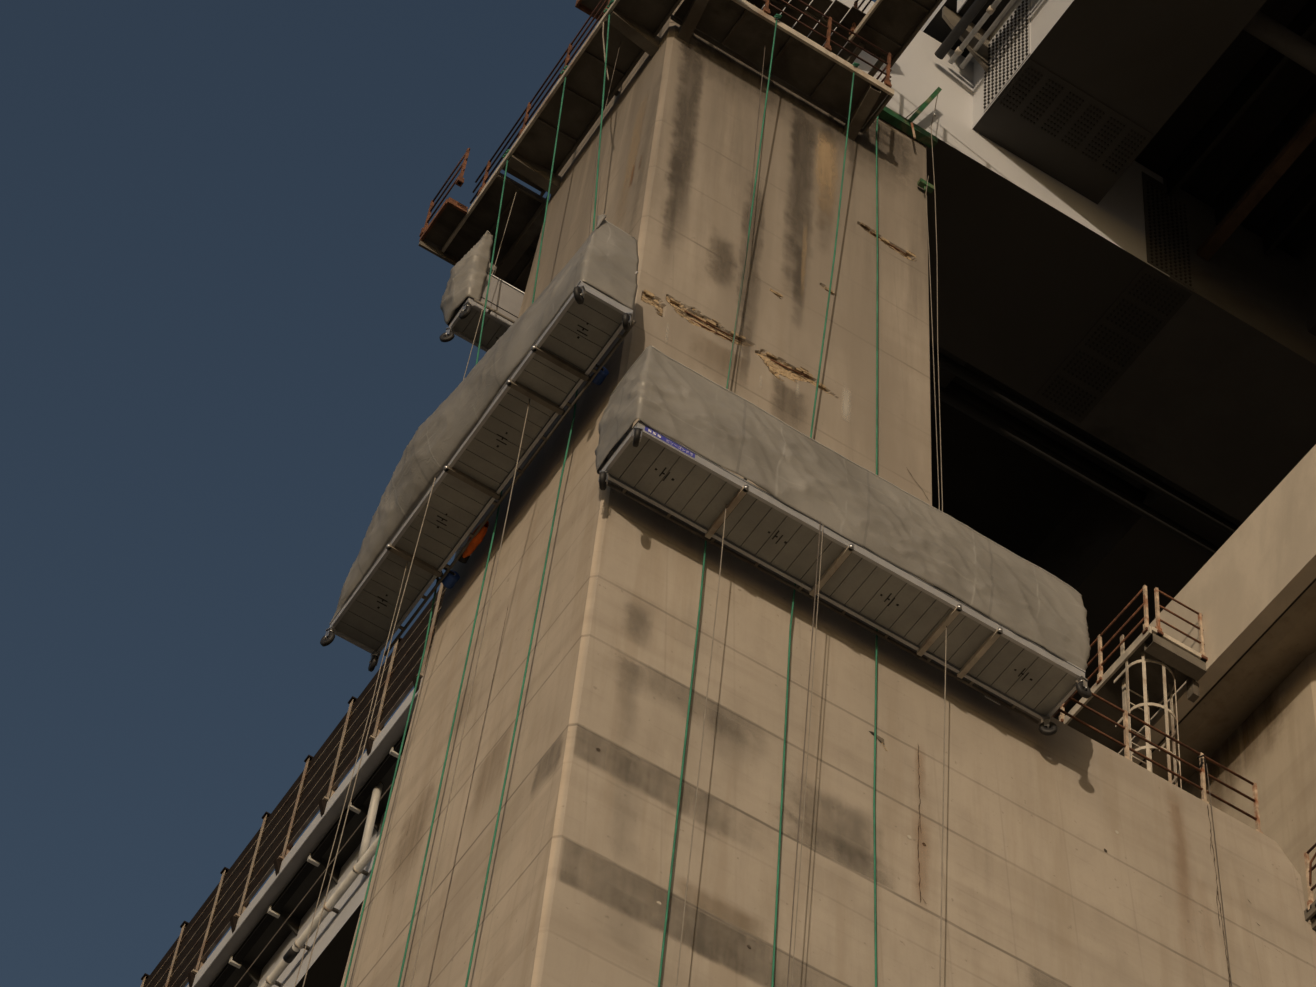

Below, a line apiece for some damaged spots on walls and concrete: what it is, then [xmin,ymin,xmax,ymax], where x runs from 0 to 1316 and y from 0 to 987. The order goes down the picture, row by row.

water stain [671,33,905,306]
spalling [860,222,917,261]
spalling [641,289,833,396]